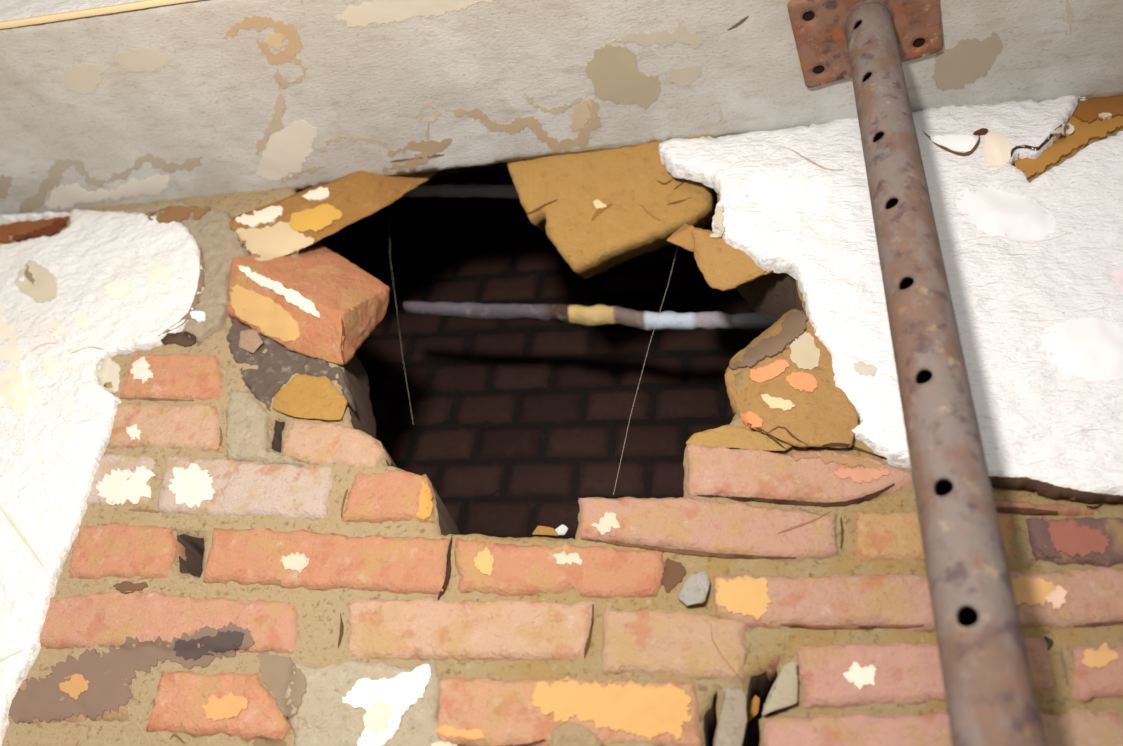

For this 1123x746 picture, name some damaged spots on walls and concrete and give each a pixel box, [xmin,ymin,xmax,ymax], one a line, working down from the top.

leakage [0,175,14,199]
leakage [19,153,203,213]
leakage [288,204,342,233]
flaking render [301,187,330,201]
leakage [255,24,703,183]
crack [923,131,980,156]
crack [1011,122,1066,157]
spalling [234,206,320,318]
flaking render [658,117,911,468]
flaking render [912,95,1123,498]
flaking render [0,205,211,746]
flaking render [343,664,431,746]